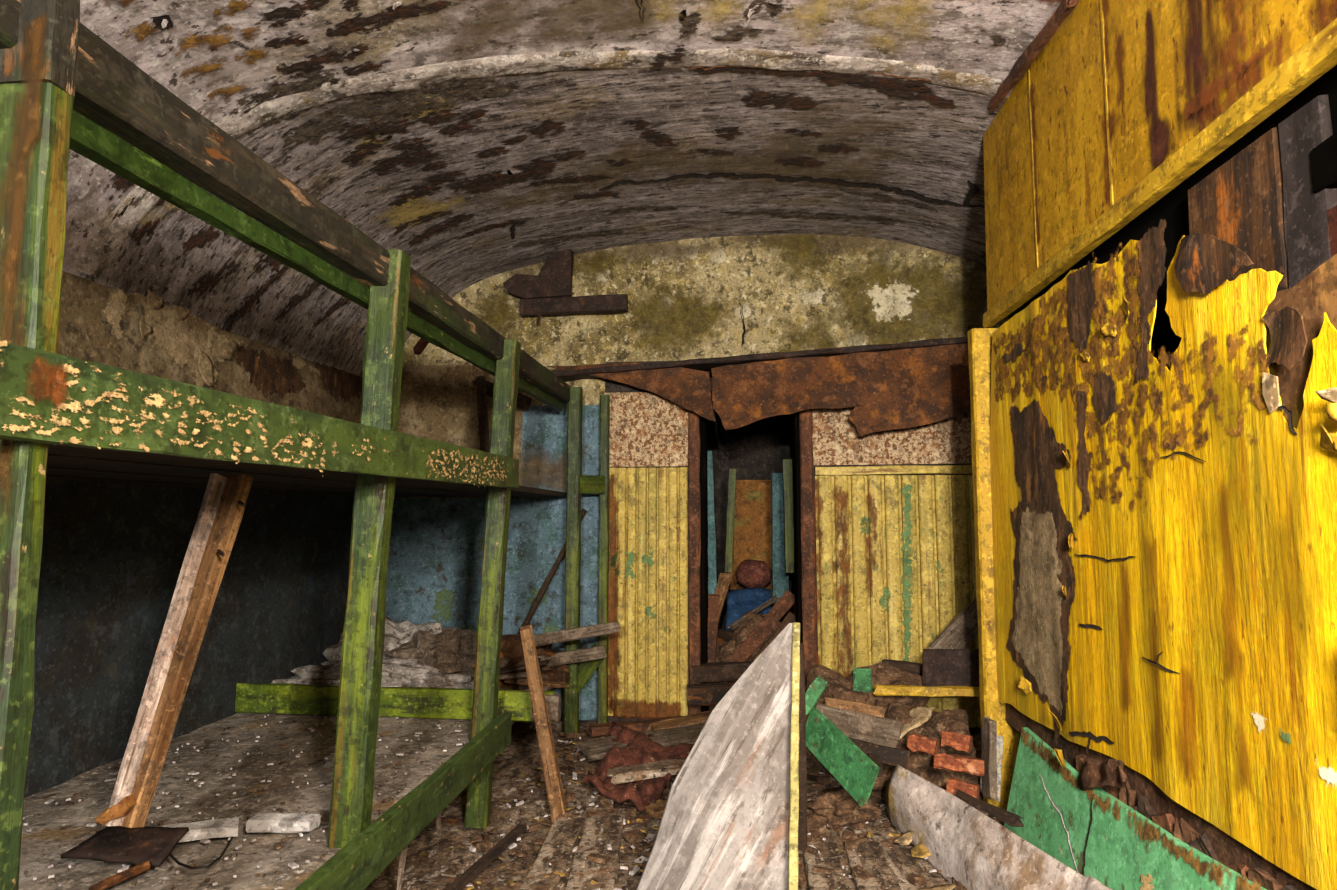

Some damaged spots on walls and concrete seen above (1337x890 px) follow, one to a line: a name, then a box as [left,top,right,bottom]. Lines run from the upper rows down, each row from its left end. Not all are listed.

rust [1310,0,1337,31]
rust [1145,0,1290,168]
leakage [566,108,892,191]
leakage [385,196,461,226]
leakage [573,242,712,275]
mould [633,288,722,348]
leakage [736,234,992,352]
peeling [1315,387,1337,452]
peeling [993,219,1269,890]